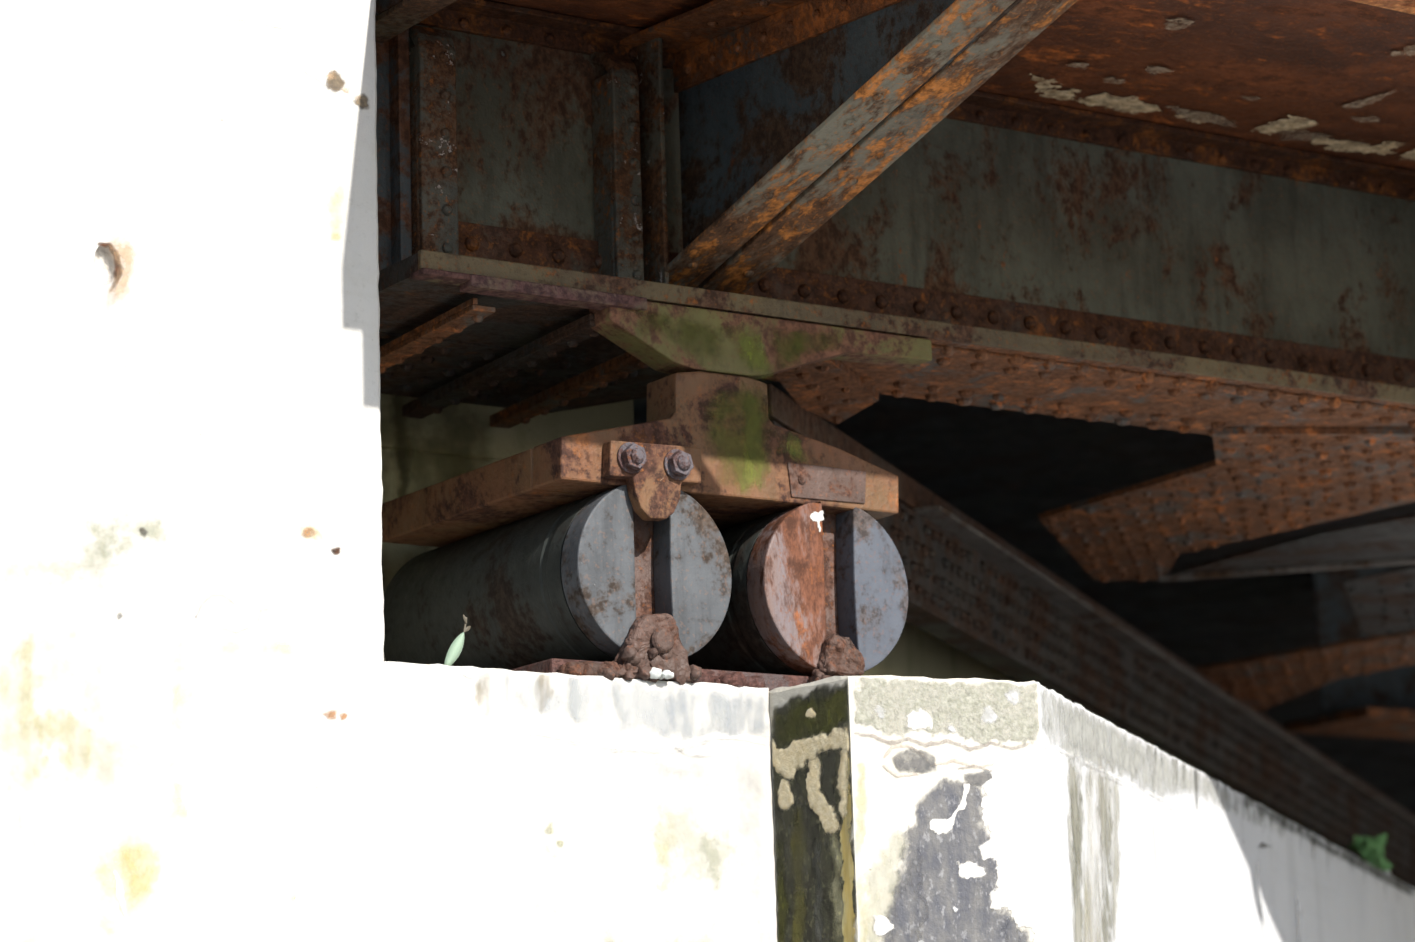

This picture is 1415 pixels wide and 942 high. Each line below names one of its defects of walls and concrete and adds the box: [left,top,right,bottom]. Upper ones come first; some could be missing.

peeling [1164,18,1194,30]
crack [211,0,349,95]
peeling [1391,45,1415,56]
peeling [1029,73,1236,127]
peeling [1343,90,1395,122]
peeling [1251,114,1415,160]
spalling [94,243,133,295]
corrosion [602,640,702,685]
corrosion [809,659,840,683]
leakage [772,677,1400,942]
peeling [861,734,1049,942]